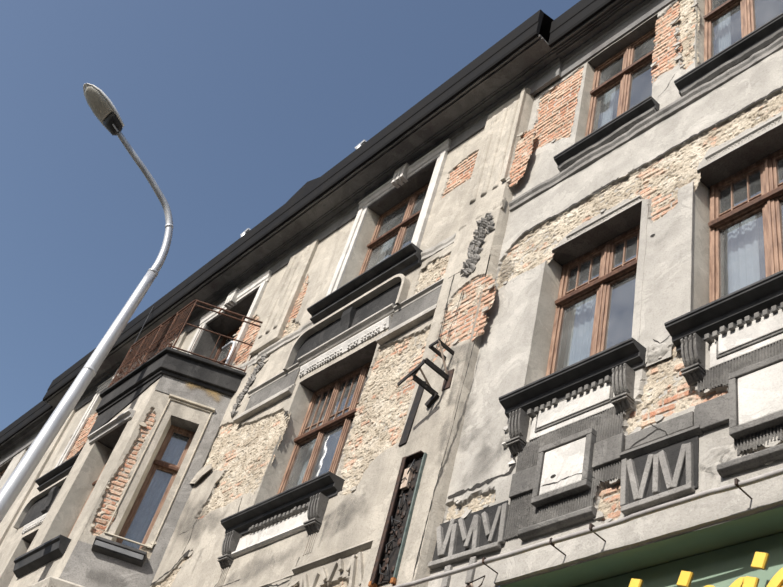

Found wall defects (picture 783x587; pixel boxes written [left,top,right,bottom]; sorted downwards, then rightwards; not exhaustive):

flaking render [651,0,701,83]
flaking render [505,68,583,187]
flaking render [433,89,783,362]
flaking render [91,408,156,536]
flaking render [189,411,291,519]
flaking render [341,329,430,495]
flaking render [626,347,728,435]
flaking render [156,550,194,587]
crack [150,485,215,586]